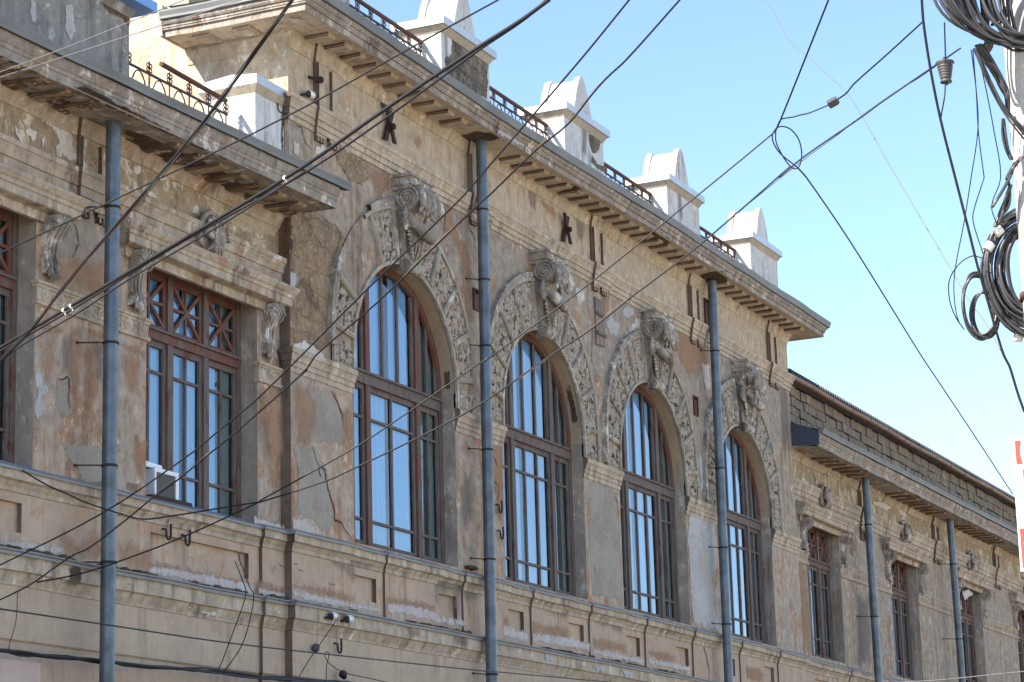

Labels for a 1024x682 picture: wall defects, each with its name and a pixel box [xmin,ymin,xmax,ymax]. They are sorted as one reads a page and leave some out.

peeling [15,118,76,164]
peeling [35,371,48,419]
crack [313,447,353,541]
leakage [149,567,472,635]